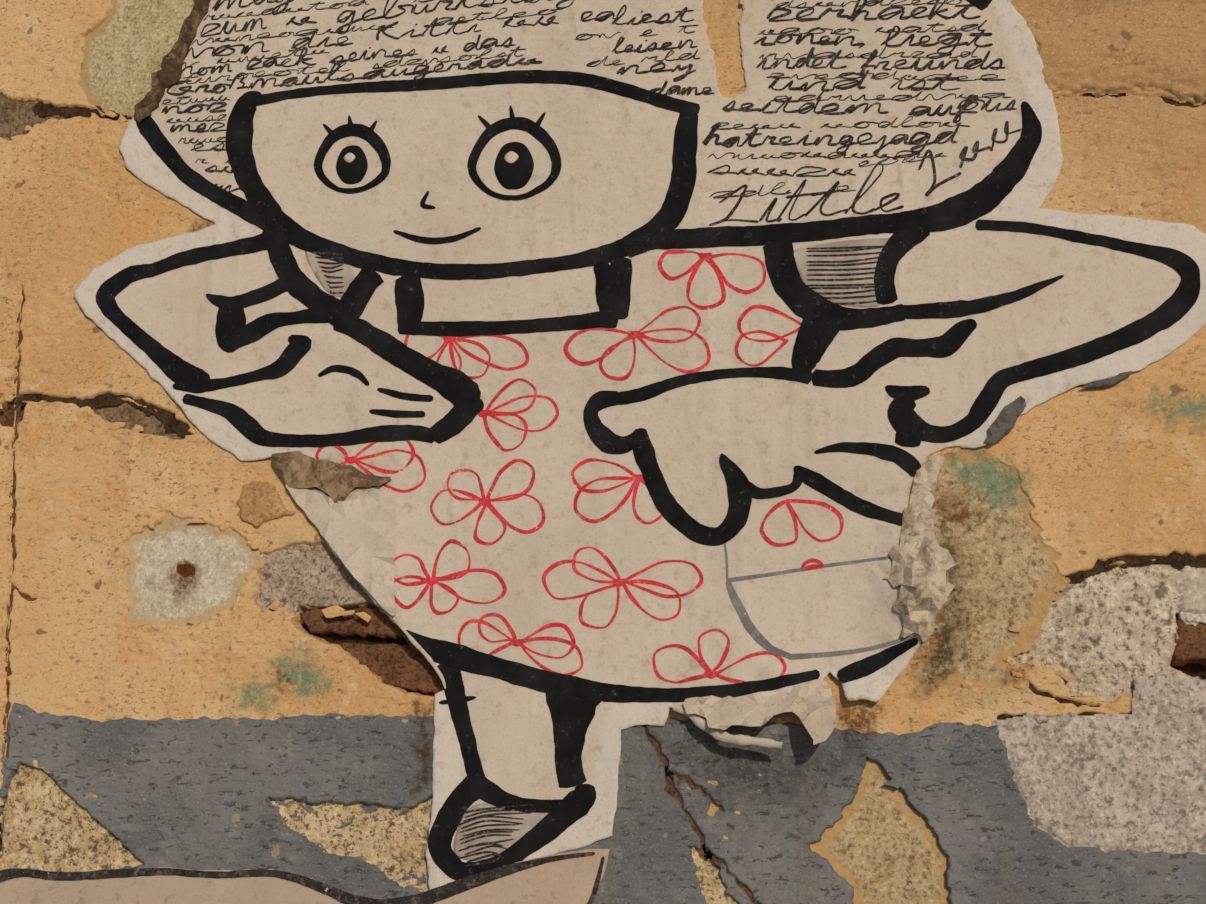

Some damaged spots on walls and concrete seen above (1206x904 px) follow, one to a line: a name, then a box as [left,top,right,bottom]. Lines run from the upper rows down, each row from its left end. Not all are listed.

crack [33,101,132,121]
spalling [80,0,194,124]
crack [3,287,192,759]
peeling [121,481,444,696]
spalling [904,448,1206,854]
spalling [0,764,144,872]
spalling [271,797,433,895]
crack [644,725,760,904]
spalling [810,760,949,904]